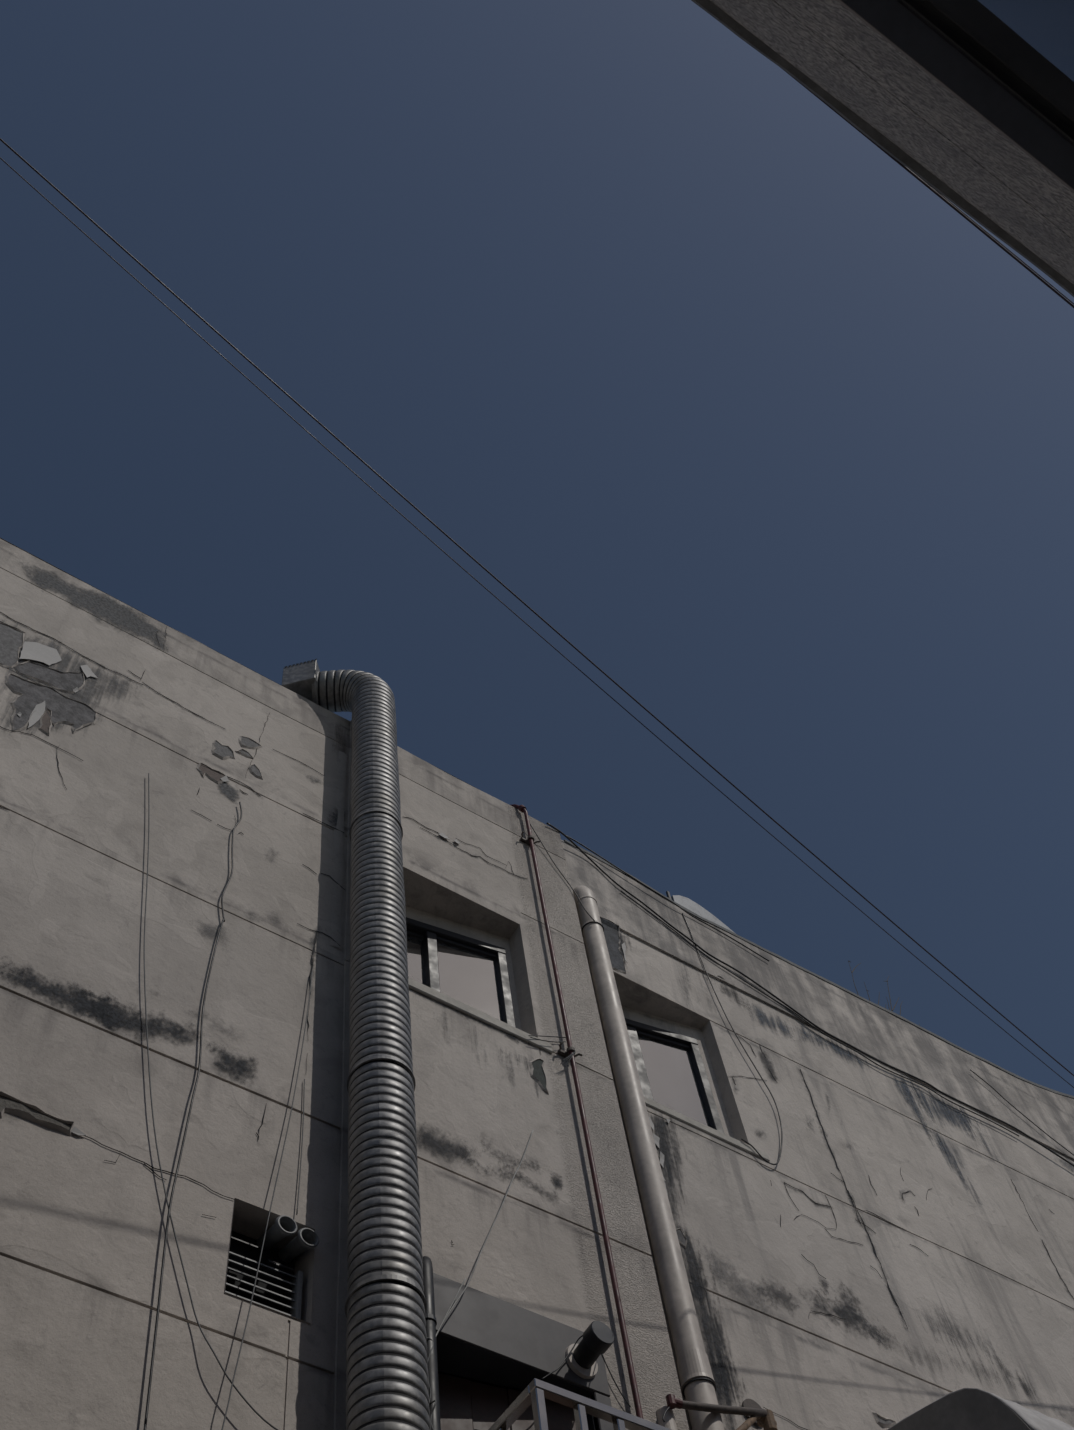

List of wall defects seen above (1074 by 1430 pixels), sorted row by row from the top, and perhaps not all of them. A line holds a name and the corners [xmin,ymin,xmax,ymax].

water stain [25,567,168,650]
peeling [0,621,128,736]
peeling [196,715,269,802]
water stain [1,967,195,1042]
water stain [213,1048,254,1083]
spalling [0,1091,86,1136]
water stain [417,1128,471,1161]
crack [731,1034,933,1329]
water stain [894,1078,971,1181]
water stain [815,1280,884,1342]